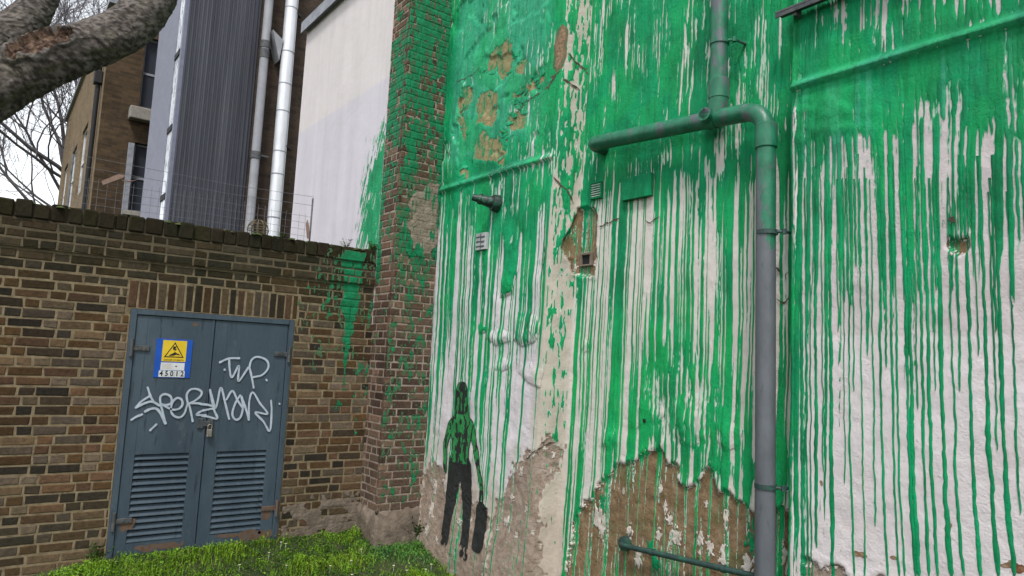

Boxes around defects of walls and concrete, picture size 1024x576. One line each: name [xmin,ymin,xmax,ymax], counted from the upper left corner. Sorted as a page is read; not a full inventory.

peeling [456,38,552,191]
spalling [562,207,598,277]
spalling [946,238,971,256]
spalling [418,433,567,576]
spalling [565,449,754,576]
spalling [776,506,789,576]